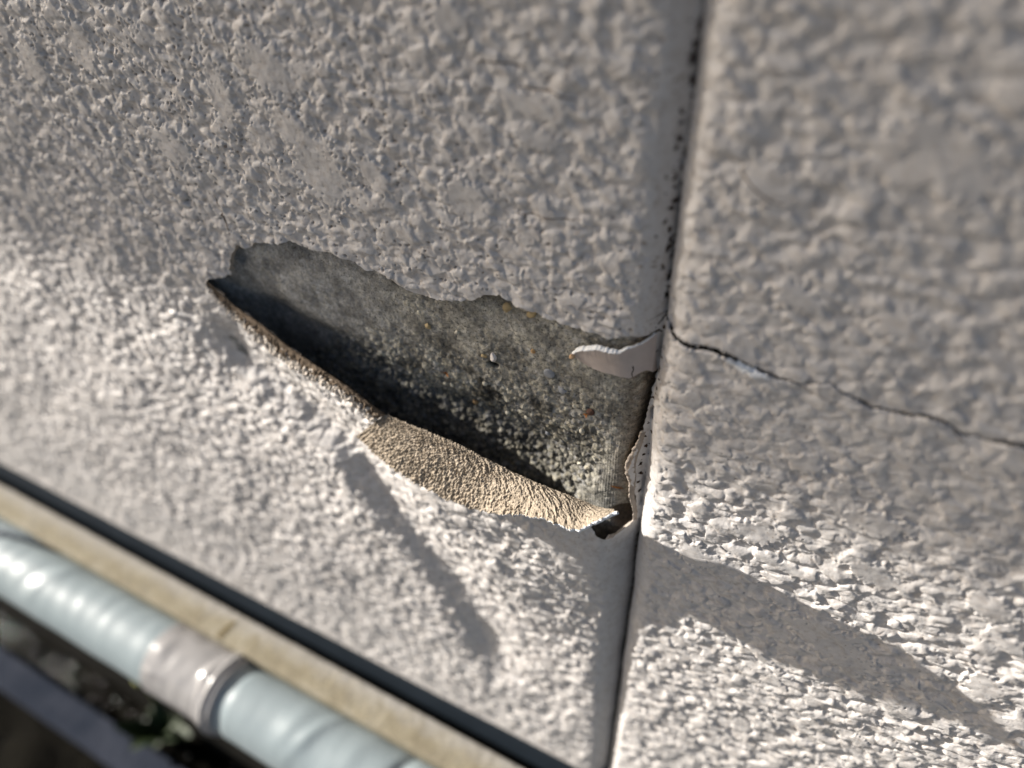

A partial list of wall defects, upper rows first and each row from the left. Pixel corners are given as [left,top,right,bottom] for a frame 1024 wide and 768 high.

peeling [205,241,659,540]
crack [649,308,1024,449]